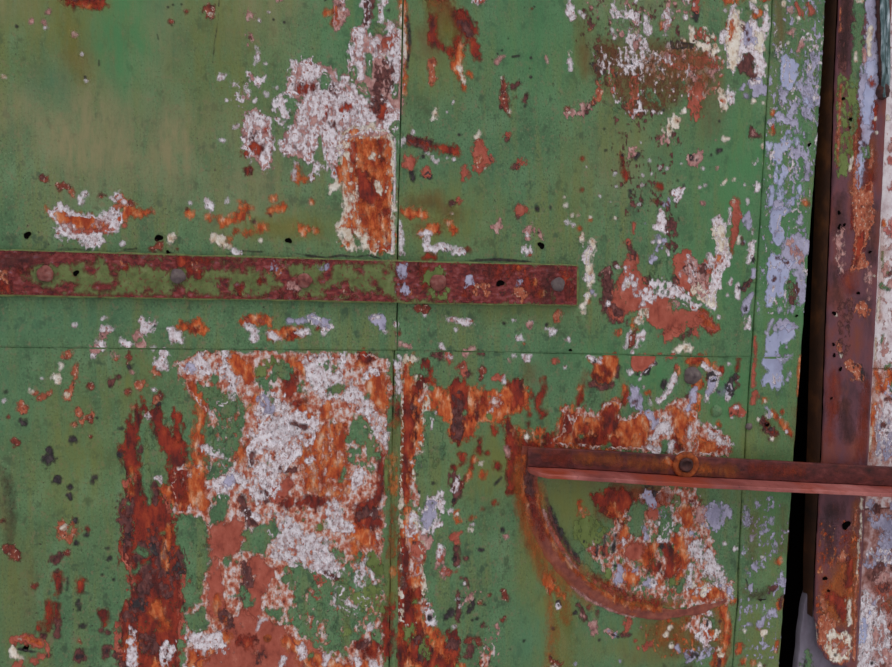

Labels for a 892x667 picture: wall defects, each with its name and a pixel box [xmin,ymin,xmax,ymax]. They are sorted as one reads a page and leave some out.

peeling [217,0,406,206]
corrosion [427,0,483,90]
peeling [7,350,98,442]
peeling [39,174,155,250]
corrosion [97,396,200,667]
peeling [90,313,393,667]
corrosion [0,122,577,305]
peeling [405,471,509,667]
corrosion [386,354,735,667]
corrosion [816,498,863,666]
corrosion [833,129,892,384]
peeling [874,219,892,461]